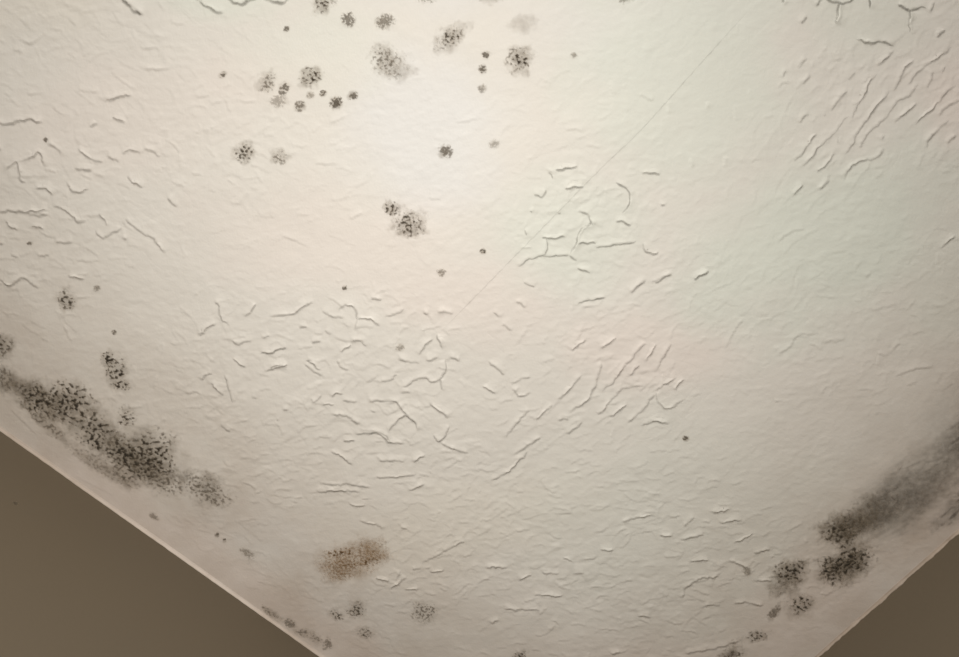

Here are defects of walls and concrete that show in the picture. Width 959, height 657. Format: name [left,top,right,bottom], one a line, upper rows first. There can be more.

crack [104,0,309,34]
crack [770,0,959,58]
peeling [0,76,194,315]
damp [103,352,128,390]
crack [182,148,726,506]
damp [4,380,176,489]
damp [778,564,804,582]
damp [822,479,936,584]